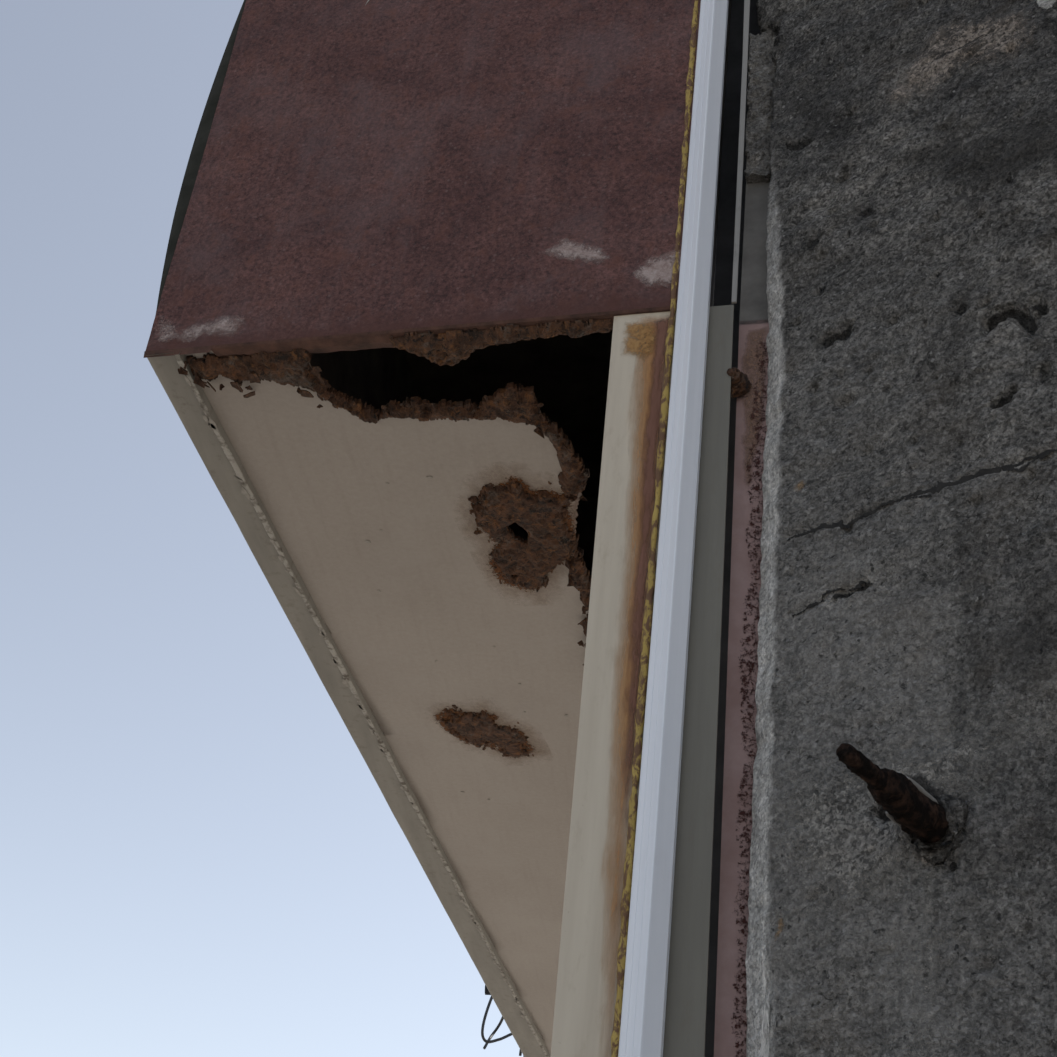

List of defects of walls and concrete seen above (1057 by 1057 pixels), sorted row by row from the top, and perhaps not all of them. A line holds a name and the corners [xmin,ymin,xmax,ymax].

rust [389,318,613,366]
rust [178,348,592,648]
crack [787,449,1057,541]
rust [609,319,669,926]
crack [792,581,872,618]
rust [435,705,534,759]
rust [731,330,769,1057]